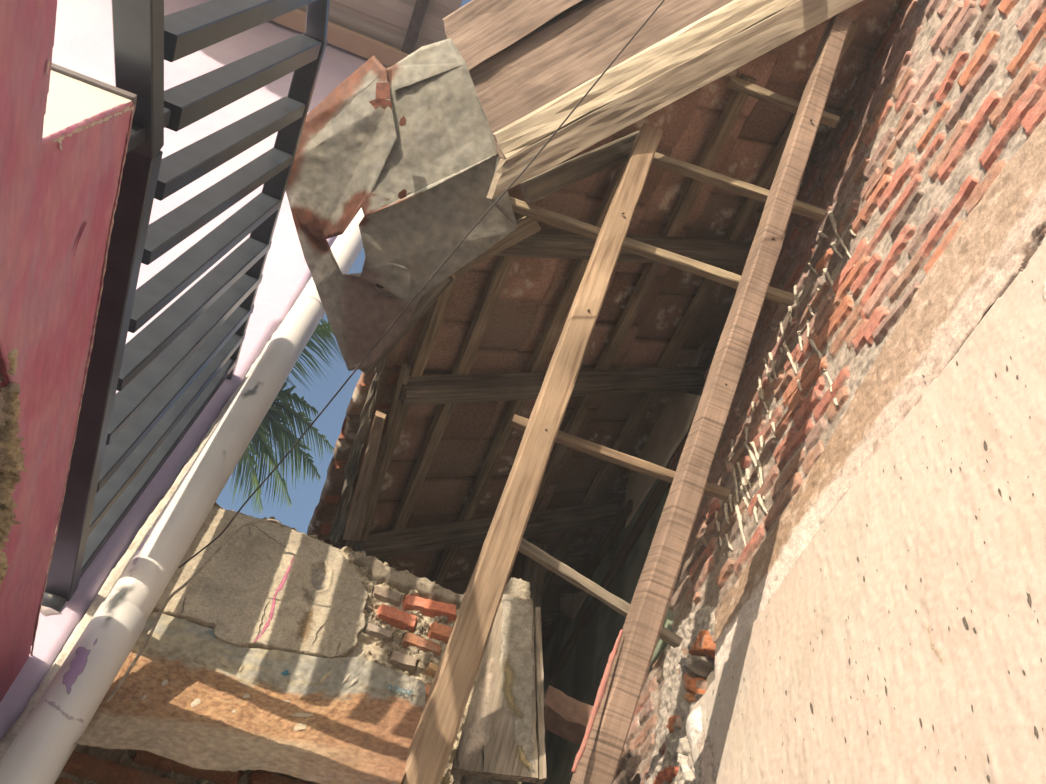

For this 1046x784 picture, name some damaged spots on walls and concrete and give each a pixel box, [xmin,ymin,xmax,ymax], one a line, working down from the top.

corrosion [369,98,406,126]
spalling [311,567,328,590]
spalling [640,605,716,784]